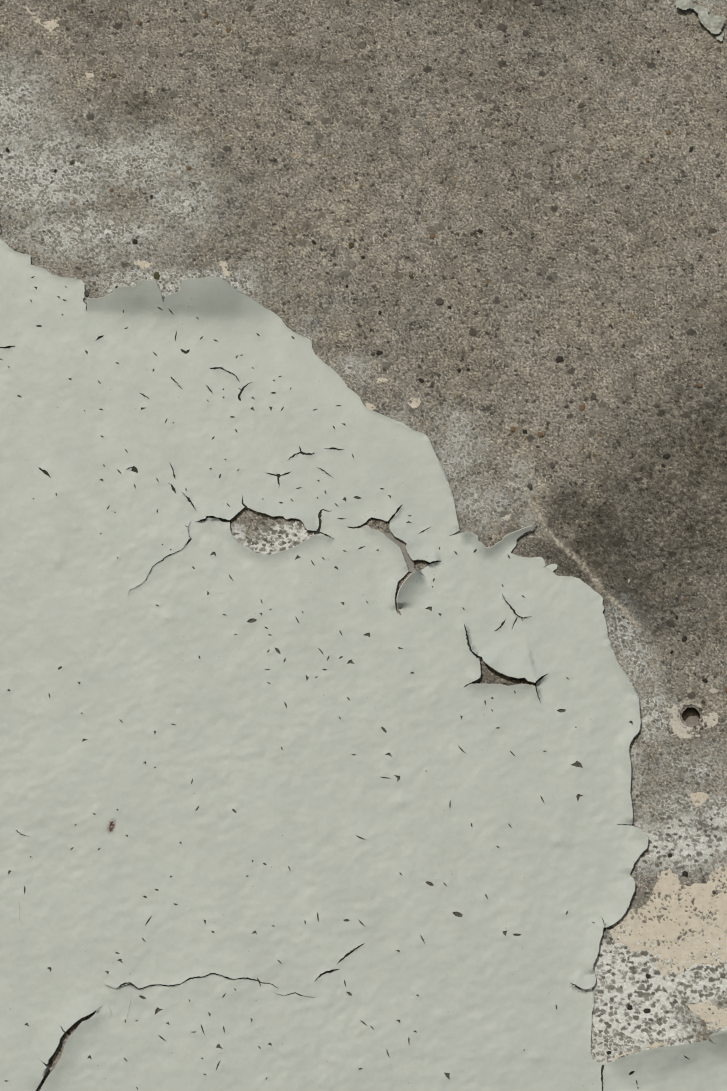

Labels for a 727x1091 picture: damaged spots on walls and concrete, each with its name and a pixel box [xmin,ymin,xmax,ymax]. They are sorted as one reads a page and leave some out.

peeling [0,228,81,284]
peeling [86,276,282,320]
crack [120,462,200,597]
peeling [196,493,334,566]
peeling [348,502,442,615]
peeling [460,514,536,559]
peeling [457,623,548,703]
peeling [570,599,649,990]
crack [99,940,365,1020]
peeling [25,997,107,1091]